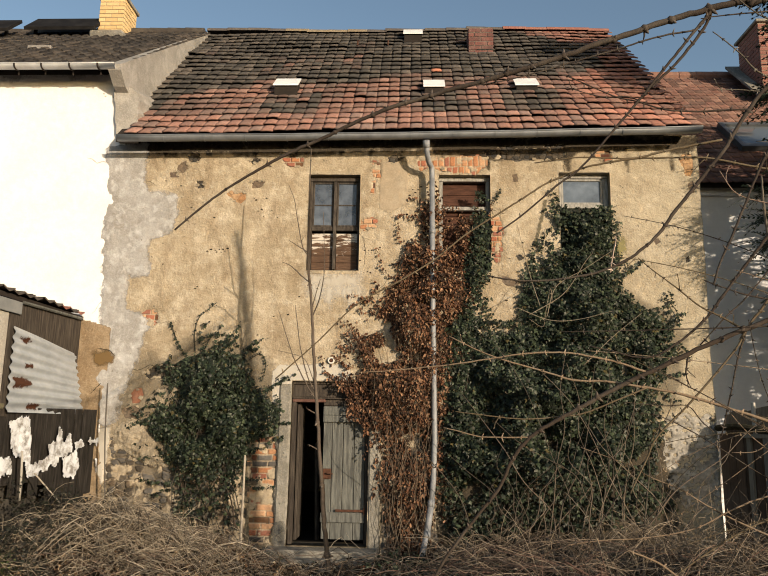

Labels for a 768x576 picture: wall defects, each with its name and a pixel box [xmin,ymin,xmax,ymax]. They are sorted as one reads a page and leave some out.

flaking render [283,157,304,168]
flaking render [418,145,565,175]
spalling [227,179,278,218]
flaking render [360,217,378,231]
flaking render [491,207,524,264]
spalling [498,275,524,287]
flaking render [142,309,161,328]
rust [13,363,33,389]
peeling [57,320,277,546]
spalling [663,413,720,513]